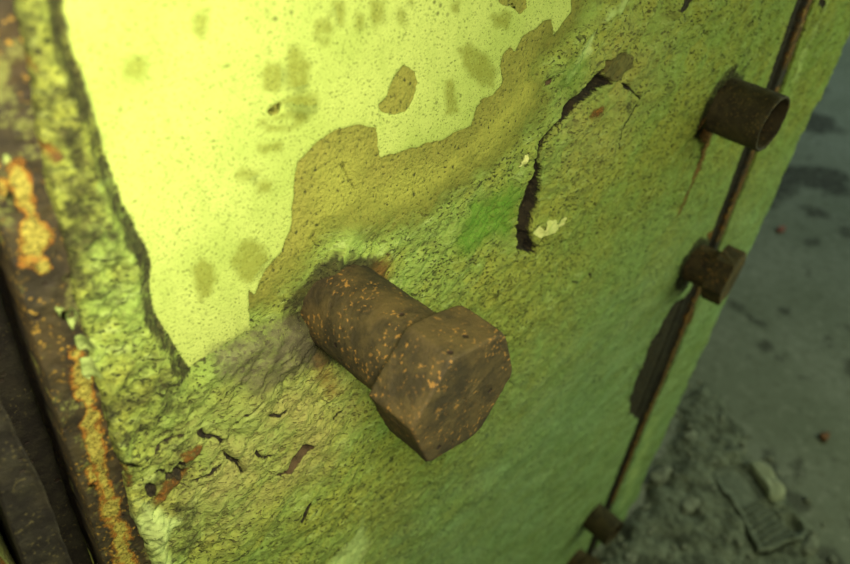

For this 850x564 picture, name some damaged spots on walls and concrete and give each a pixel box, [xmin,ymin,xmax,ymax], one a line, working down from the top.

peeling [248,0,580,309]
crack [515,52,641,254]
crack [236,408,287,423]
corrosion [154,445,202,504]
crack [127,428,272,482]